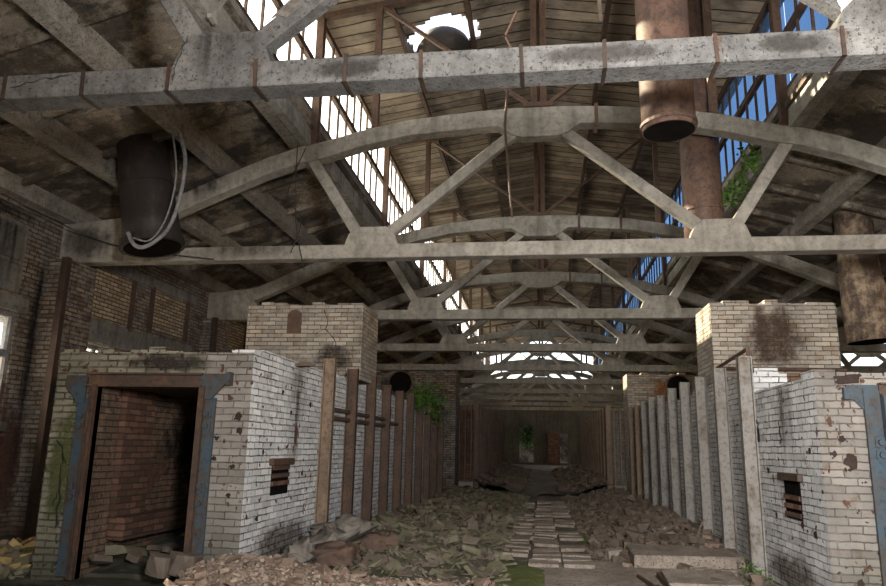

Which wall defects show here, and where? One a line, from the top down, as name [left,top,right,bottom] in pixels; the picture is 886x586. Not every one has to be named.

spalling [830,435,857,472]